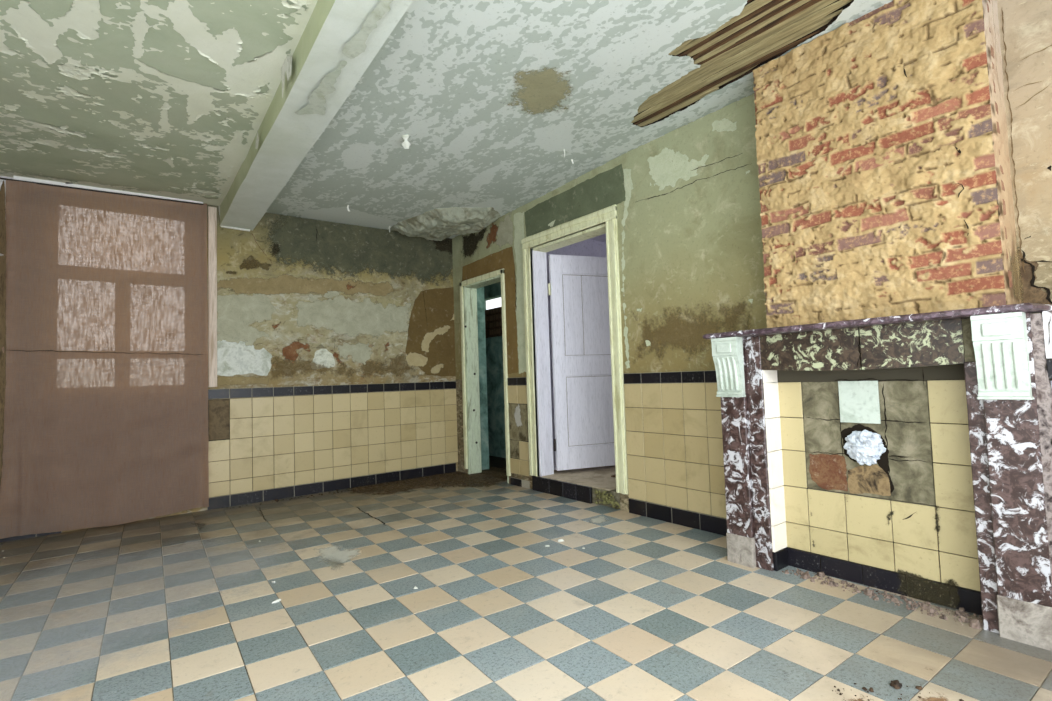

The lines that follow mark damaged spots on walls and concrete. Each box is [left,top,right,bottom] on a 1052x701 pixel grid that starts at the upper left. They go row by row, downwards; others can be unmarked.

peeling [790,0,893,50]
peeling [0,0,308,199]
water stain [508,68,572,114]
peeling [267,0,754,374]
crack [992,3,1052,343]
peeling [217,274,411,386]
flaking render [1018,250,1051,305]
peeling [208,399,230,440]
peeling [802,381,935,505]